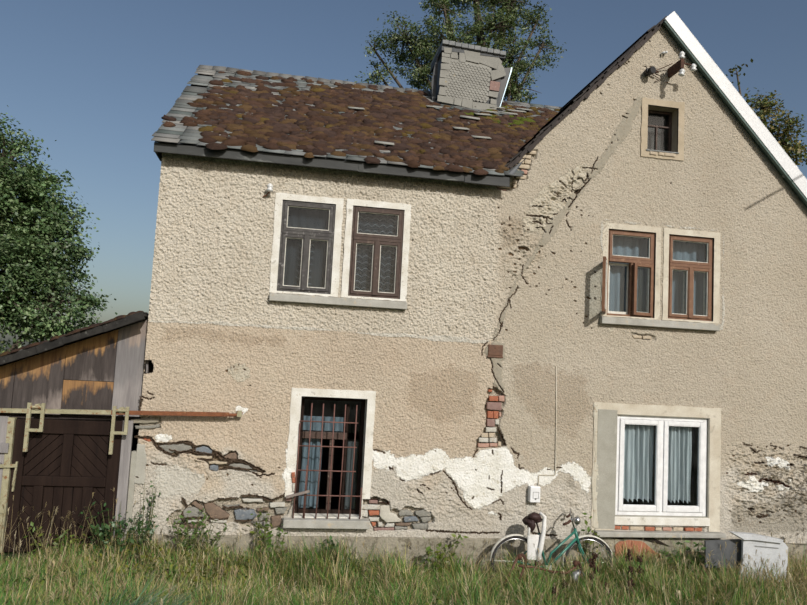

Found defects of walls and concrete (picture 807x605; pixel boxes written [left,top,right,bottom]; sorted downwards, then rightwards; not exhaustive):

crack [526,156,598,234]
crack [481,265,527,393]
spalling [131,416,265,480]
flaking render [474,388,505,452]
flaking render [737,443,793,496]
flaking render [167,495,292,530]
flaking render [362,497,434,531]